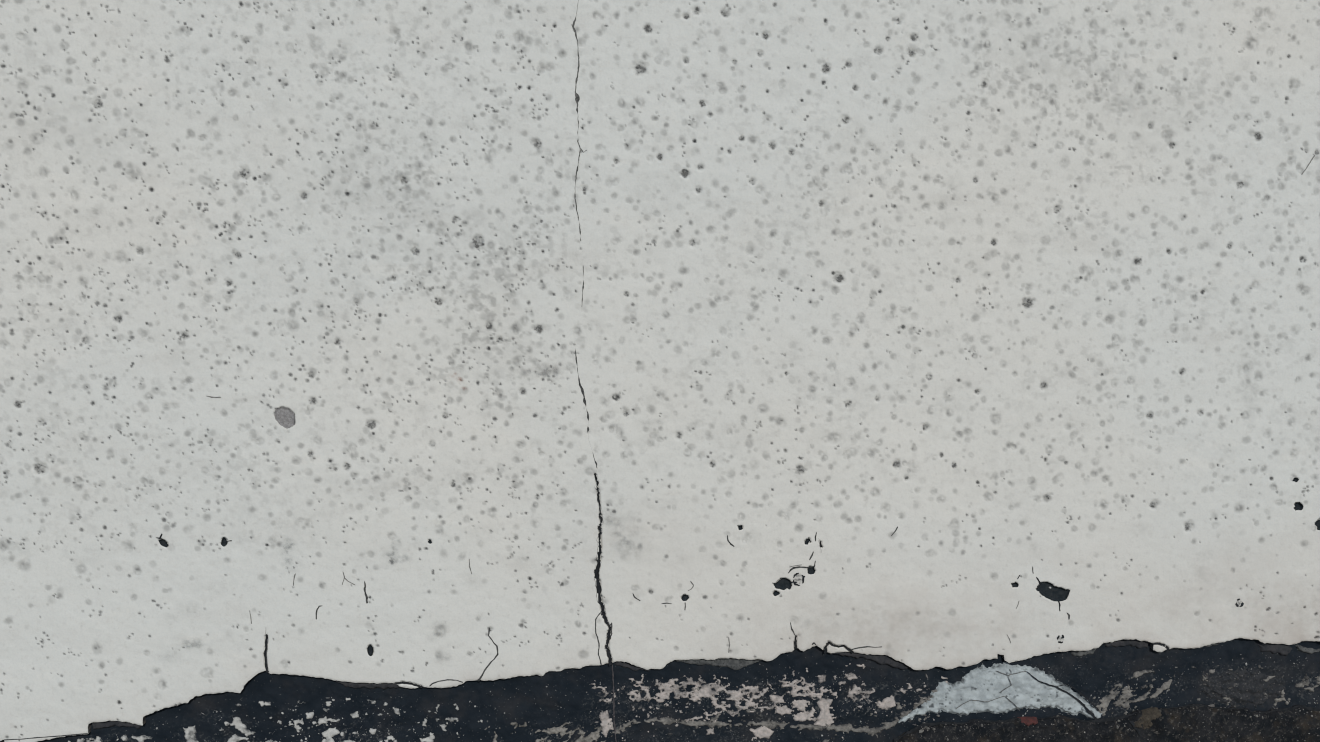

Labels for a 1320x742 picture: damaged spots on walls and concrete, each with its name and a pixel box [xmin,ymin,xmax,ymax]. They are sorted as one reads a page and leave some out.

crack [572,0,587,302]
crack [575,350,694,742]
spalling [773,567,815,596]
spalling [1012,566,1070,611]
spalling [37,635,1320,742]